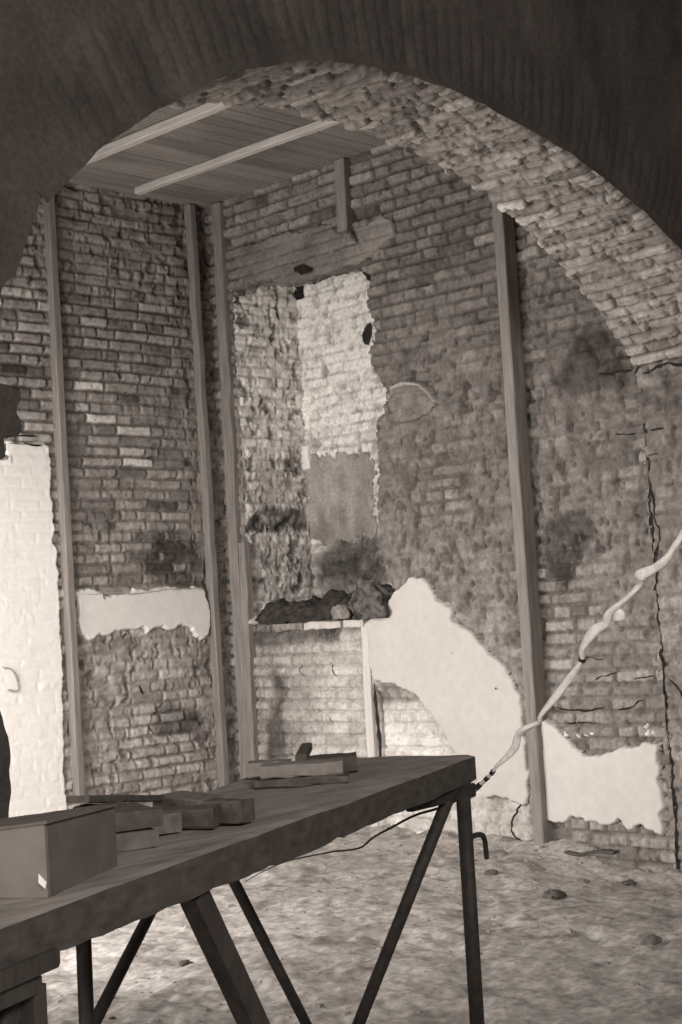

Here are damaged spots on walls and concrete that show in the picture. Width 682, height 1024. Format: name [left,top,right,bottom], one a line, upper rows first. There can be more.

crack [598,362,682,375]
crack [556,427,682,870]